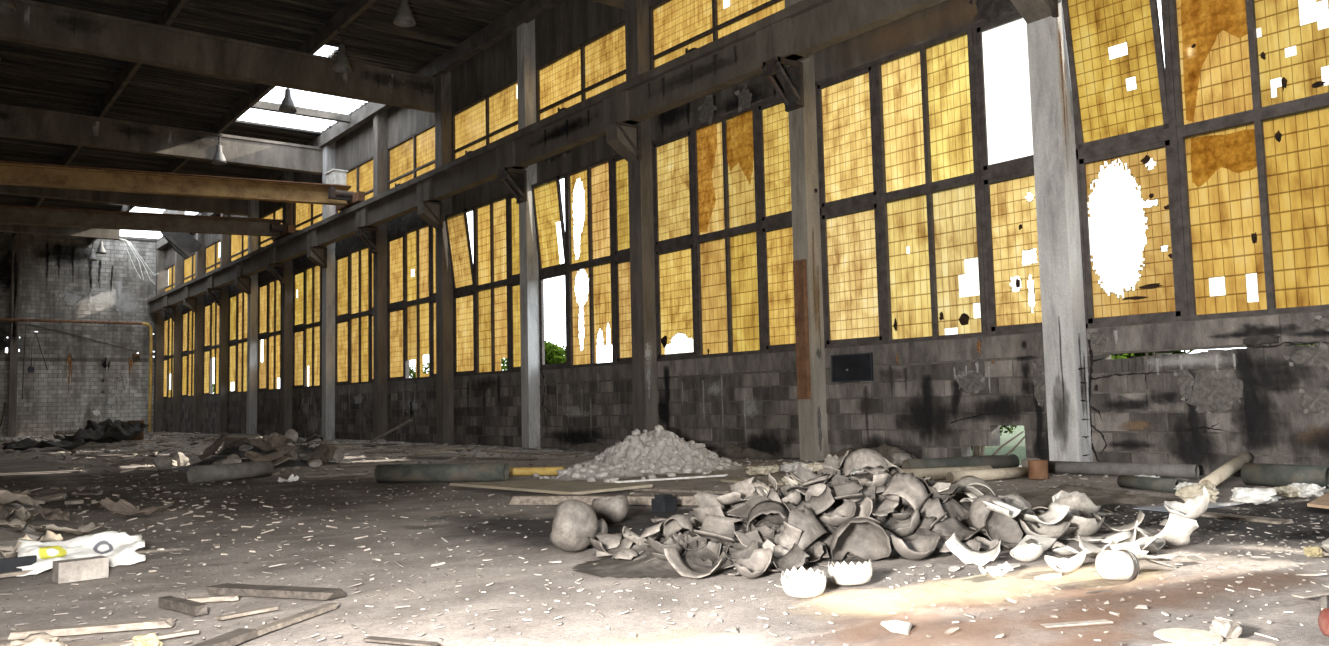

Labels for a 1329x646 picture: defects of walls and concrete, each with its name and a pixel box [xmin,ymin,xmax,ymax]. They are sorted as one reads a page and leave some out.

damp [46,244,138,311]
damp [1156,351,1258,444]